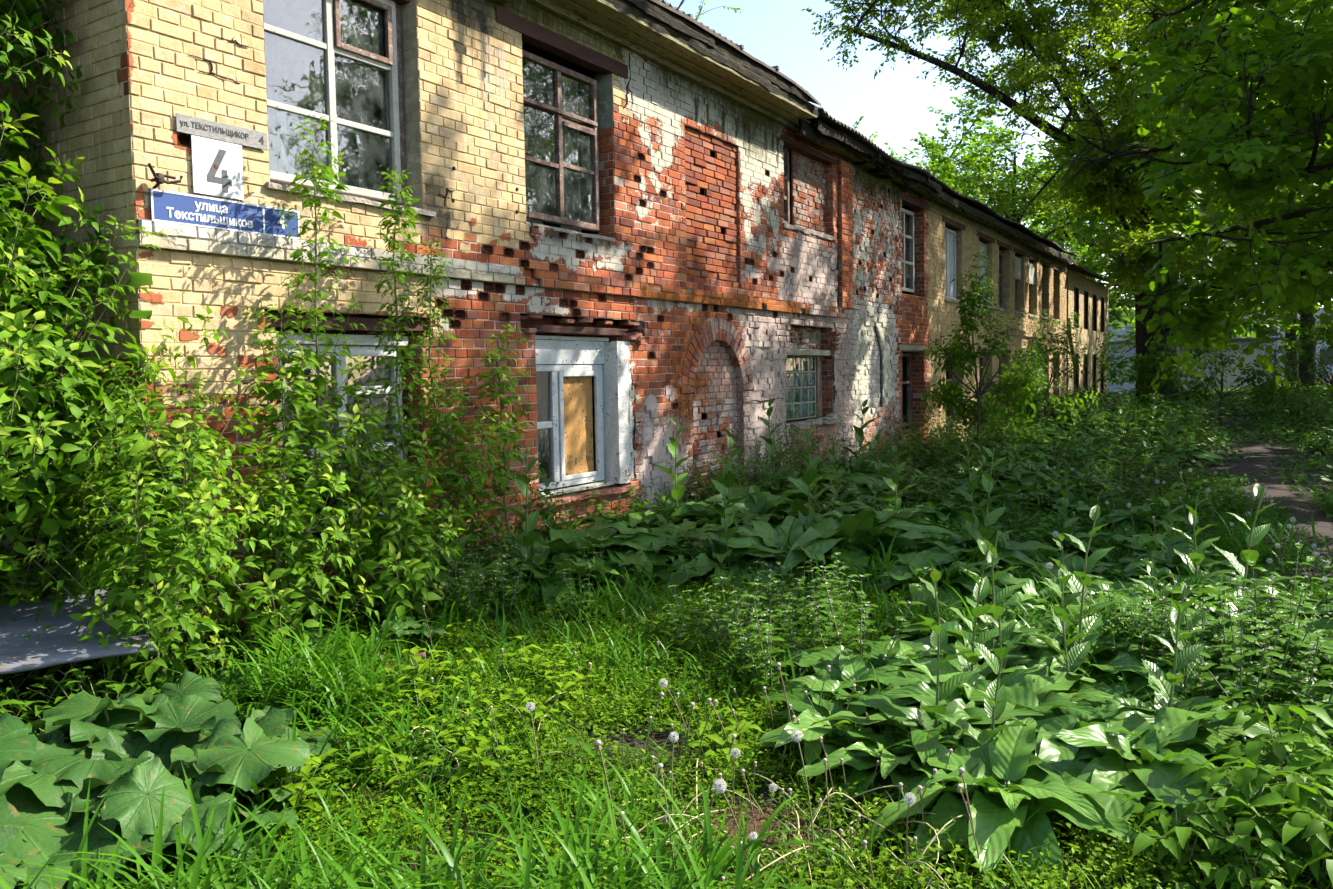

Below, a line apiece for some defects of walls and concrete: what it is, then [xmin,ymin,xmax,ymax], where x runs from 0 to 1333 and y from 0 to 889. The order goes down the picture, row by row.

peeling [125,0,136,88]
water stain [452,0,506,128]
spalling [171,130,195,156]
peeling [134,185,188,247]
peeling [139,291,165,305]
peeling [618,47,900,478]
peeling [160,328,274,415]
spalling [206,218,734,513]